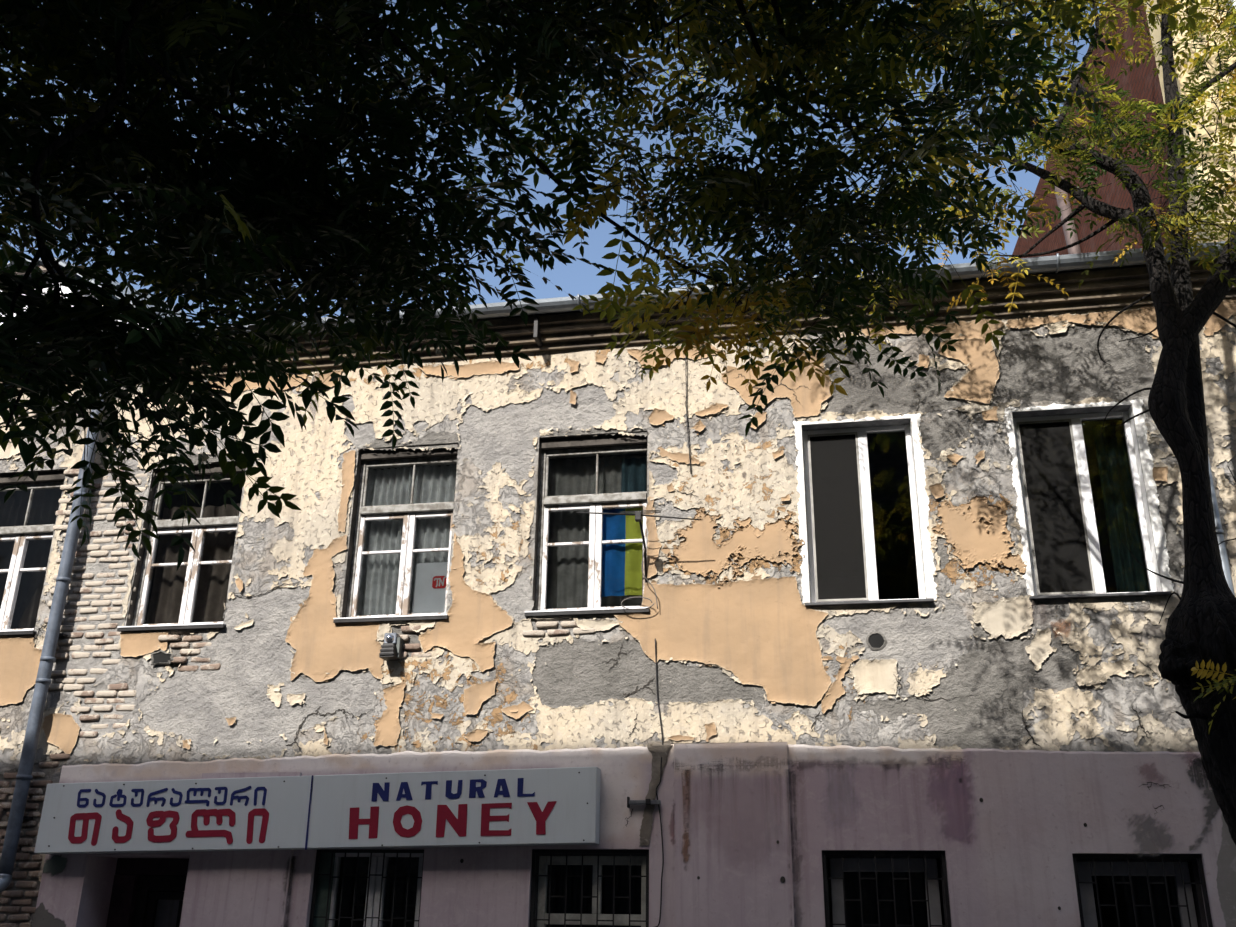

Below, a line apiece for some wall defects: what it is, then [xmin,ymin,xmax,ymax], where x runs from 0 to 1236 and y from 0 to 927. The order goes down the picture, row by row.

peeling [1203,298,1236,336]
flaking render [1207,424,1235,575]
flaking render [0,359,1138,927]